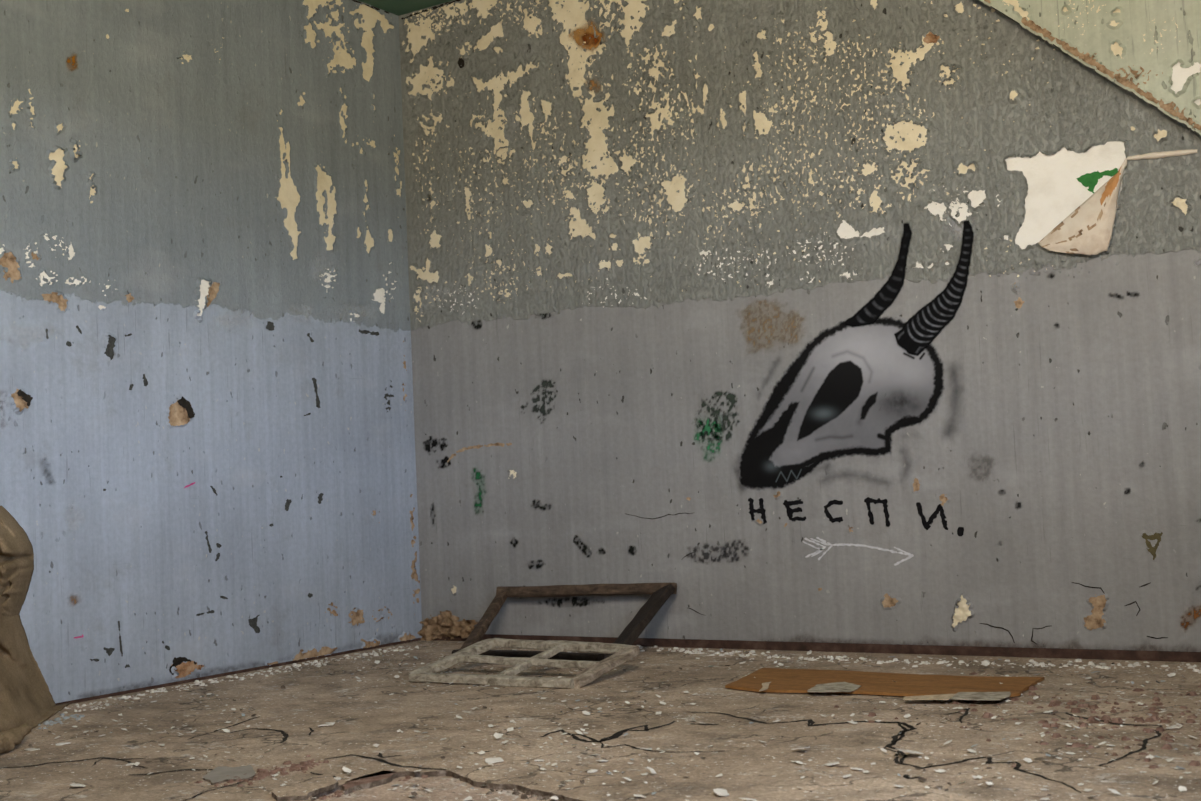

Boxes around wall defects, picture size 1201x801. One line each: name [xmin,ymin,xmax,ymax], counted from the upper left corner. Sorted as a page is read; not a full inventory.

rust [571,22,603,50]
peeling [45,120,83,191]
peeling [273,92,338,292]
peeling [300,0,1201,322]
flaking render [166,396,195,429]
flaking render [52,492,713,801]
crack [4,757,277,801]
crack [187,716,447,779]
crack [541,712,1082,793]
crack [944,708,970,723]
peeling [817,659,1201,801]
crack [1064,712,1163,768]